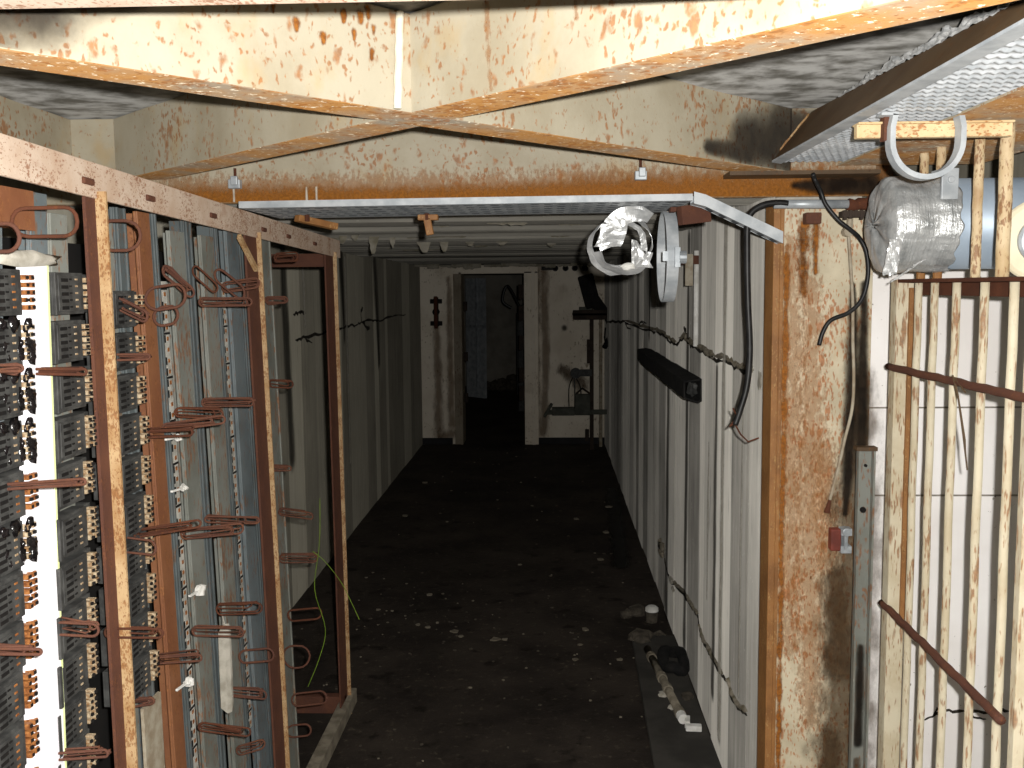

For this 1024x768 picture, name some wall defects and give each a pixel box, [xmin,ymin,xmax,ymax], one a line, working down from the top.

corrosion [340,4,375,41]
corrosion [182,173,869,203]
crack [293,307,406,343]
corrosion [776,221,819,768]
water stain [819,372,876,768]
crack [924,707,1009,720]